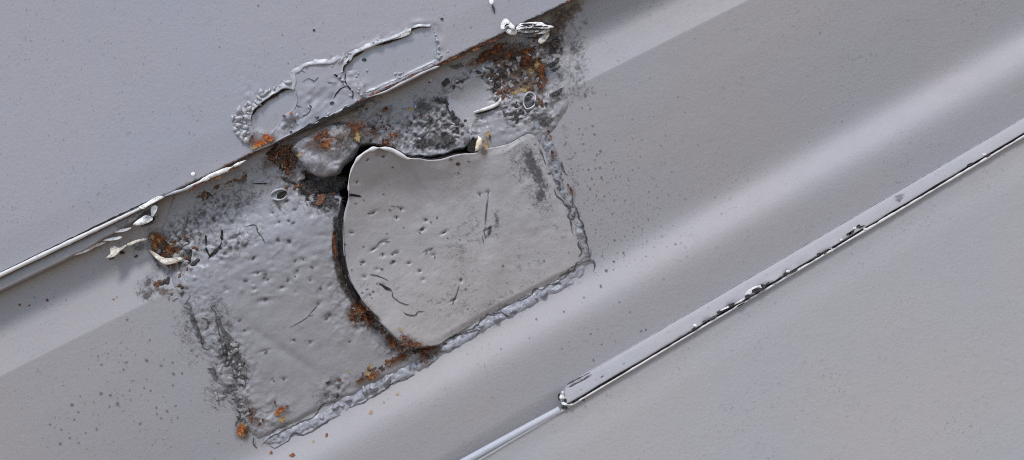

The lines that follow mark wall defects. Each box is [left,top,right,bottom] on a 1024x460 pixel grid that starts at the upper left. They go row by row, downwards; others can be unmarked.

rust [442,37,544,95]
rust [249,120,397,175]
peeling [247,18,558,223]
peeling [75,160,249,300]
rust [149,233,178,266]
peeling [214,342,251,423]
rust [338,328,435,382]
peeling [351,261,430,374]